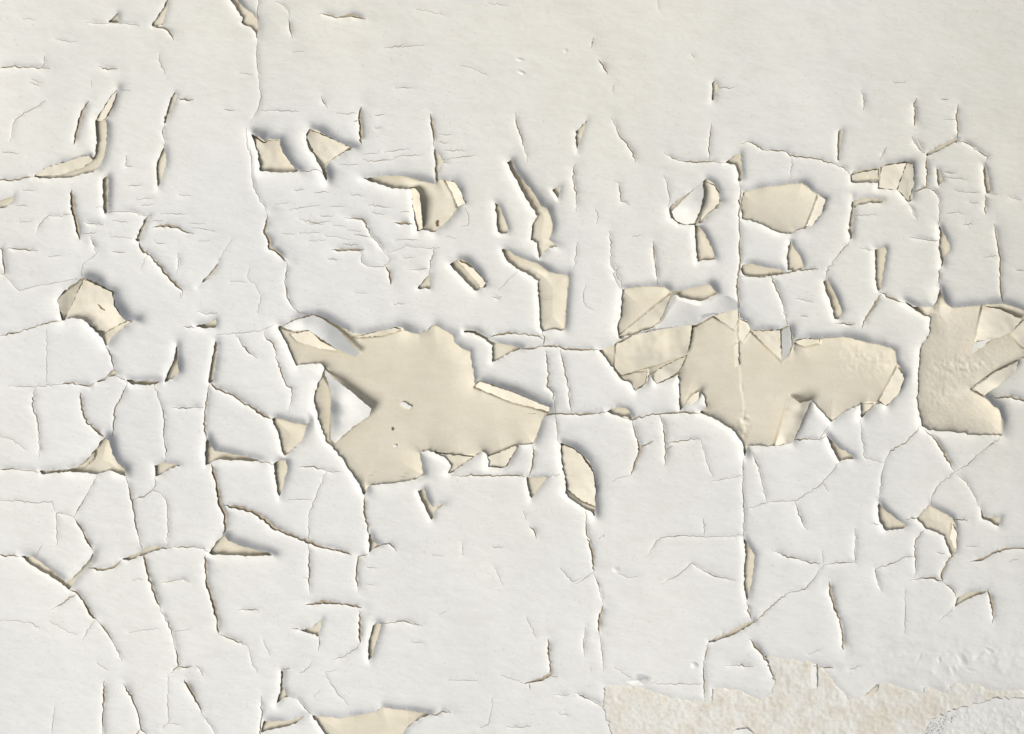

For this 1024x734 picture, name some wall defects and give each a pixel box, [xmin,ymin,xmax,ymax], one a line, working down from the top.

peeling [57,278,132,345]
crack [0,0,474,734]
peeling [272,314,550,520]
peeling [364,149,465,232]
peeling [502,160,569,332]
crack [491,331,837,551]
peeling [599,279,904,456]
crack [664,124,871,325]
crack [835,292,904,327]
crack [894,82,1023,304]
peeling [906,289,1024,436]
crack [457,419,1024,716]